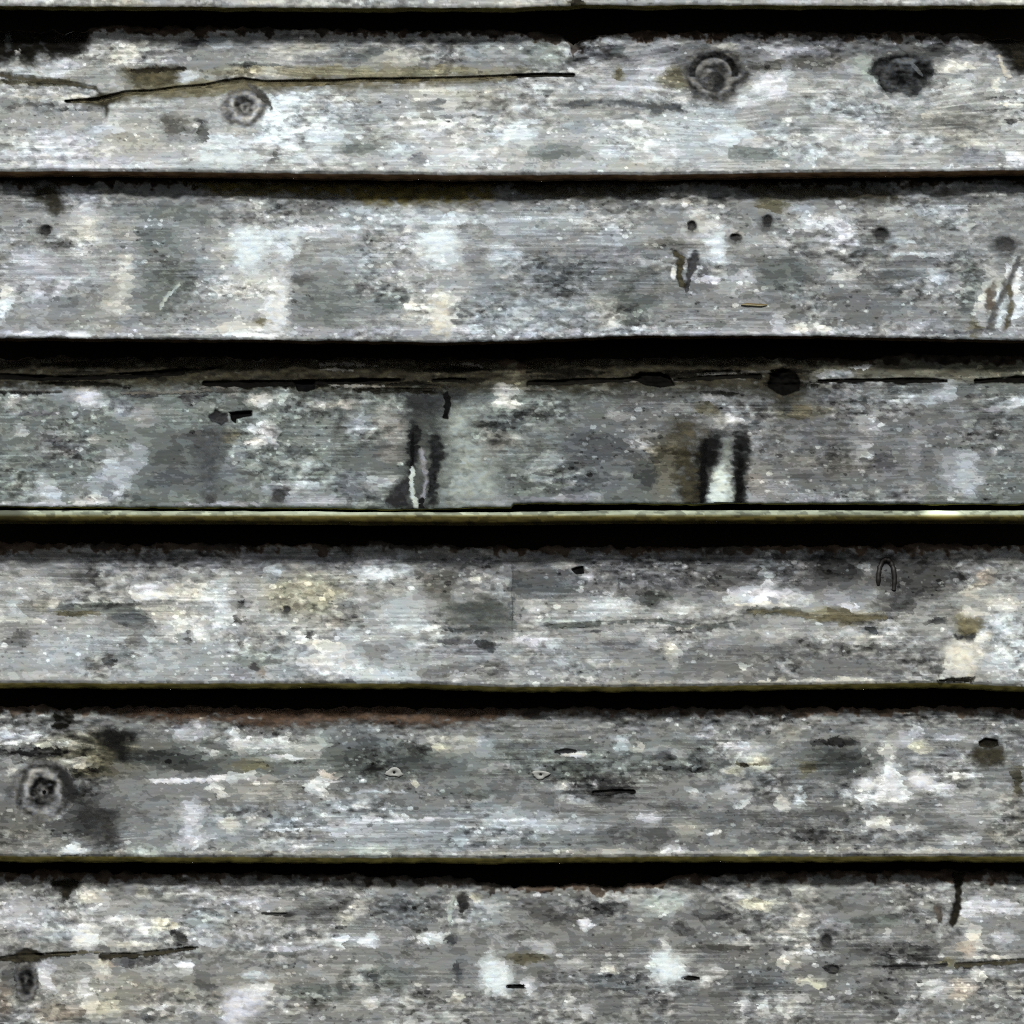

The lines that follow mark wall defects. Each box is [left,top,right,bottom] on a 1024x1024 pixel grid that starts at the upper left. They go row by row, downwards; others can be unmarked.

crack [0,72,575,114]
crack [0,370,467,392]
crack [526,376,642,385]
crack [673,373,762,381]
crack [818,376,948,384]
crack [974,375,1024,383]
water stain [315,366,491,508]
water stain [668,422,751,503]